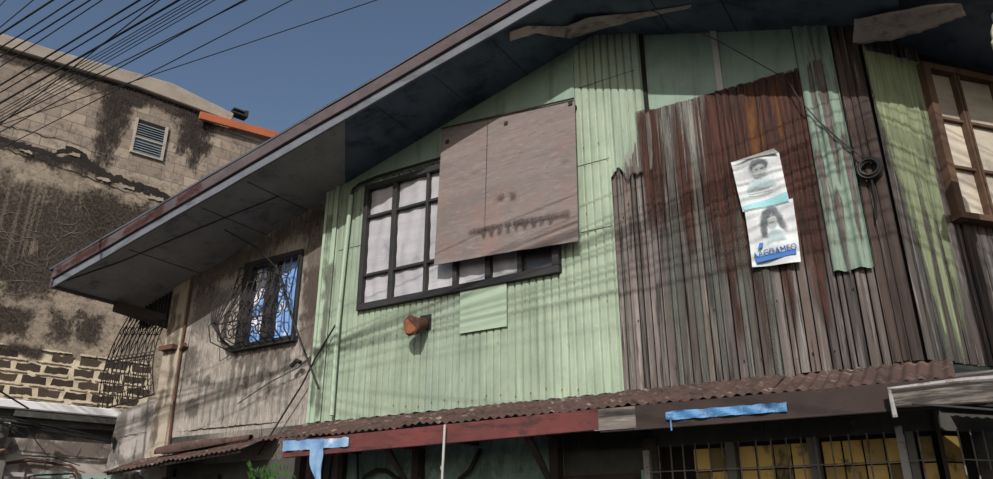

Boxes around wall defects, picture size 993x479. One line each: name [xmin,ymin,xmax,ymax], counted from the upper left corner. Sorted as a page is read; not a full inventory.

spalling [0,136,171,202]
water stain [0,50,217,169]
water stain [0,170,150,346]